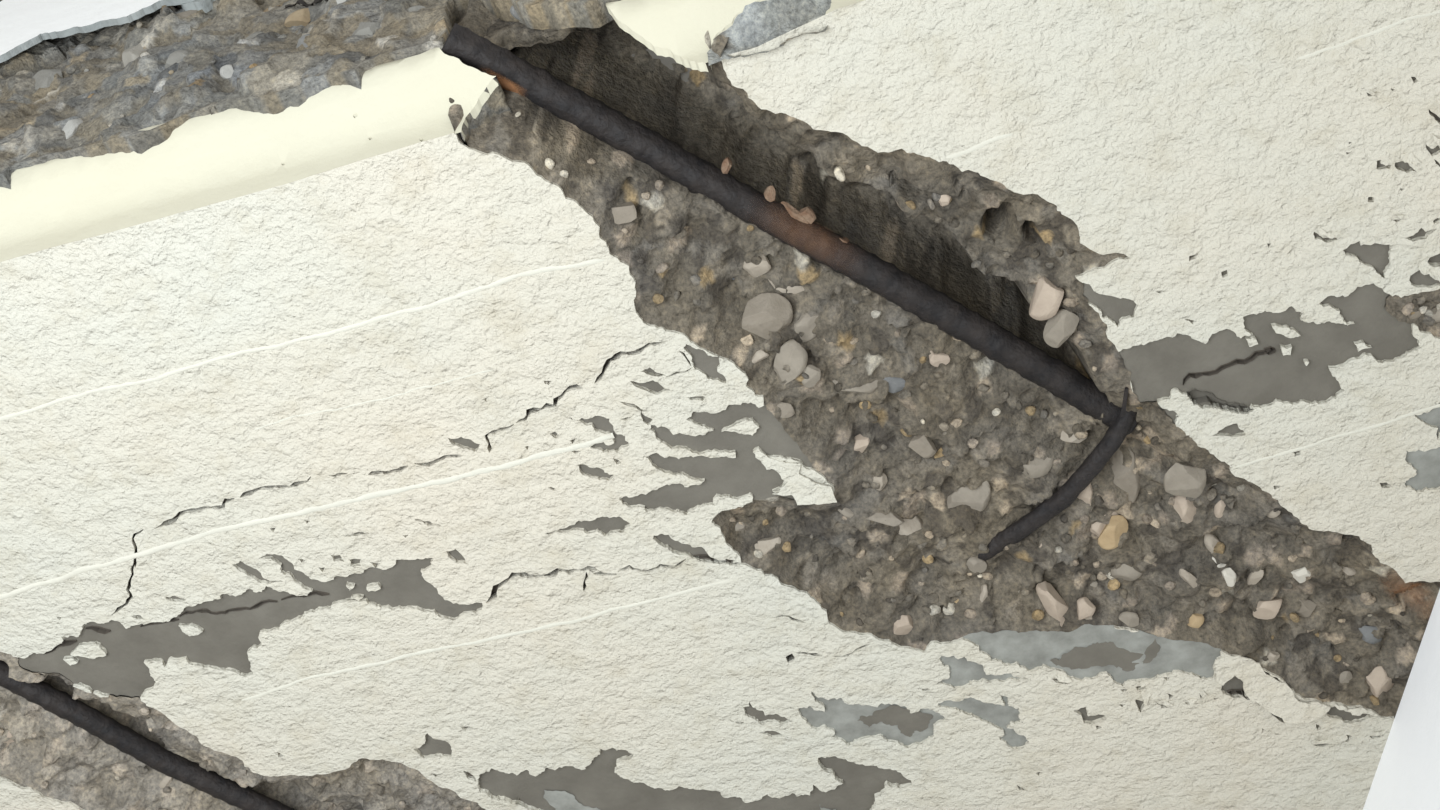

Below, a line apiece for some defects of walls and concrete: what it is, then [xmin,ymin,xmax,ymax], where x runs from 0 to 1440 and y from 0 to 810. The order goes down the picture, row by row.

spalling [0,0,469,189]
corrosion [491,74,519,94]
peeling [451,437,479,449]
crack [485,341,690,450]
spalling [456,0,1440,727]
crack [44,455,447,654]
crack [488,554,742,600]
spalling [0,554,912,810]
peeling [799,692,1028,747]